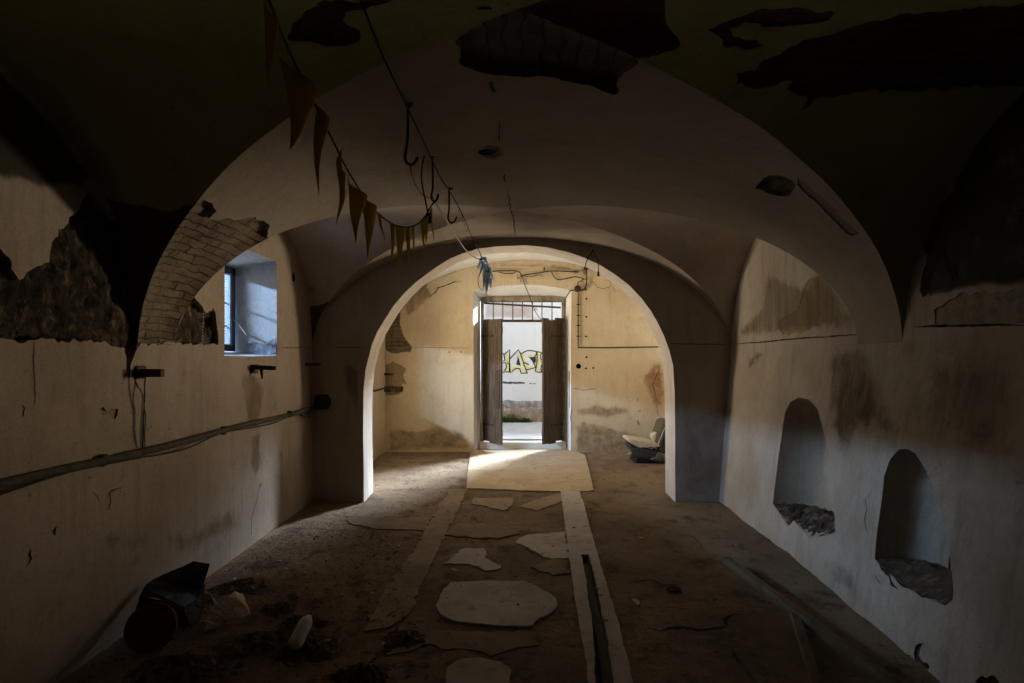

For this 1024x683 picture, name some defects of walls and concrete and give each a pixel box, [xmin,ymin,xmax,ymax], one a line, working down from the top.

spalling [287,0,394,47]
spalling [454,0,680,95]
peeling [709,7,835,50]
spalling [736,3,1024,110]
spalling [0,190,270,375]
spalling [247,338,276,355]
spalling [385,313,412,395]